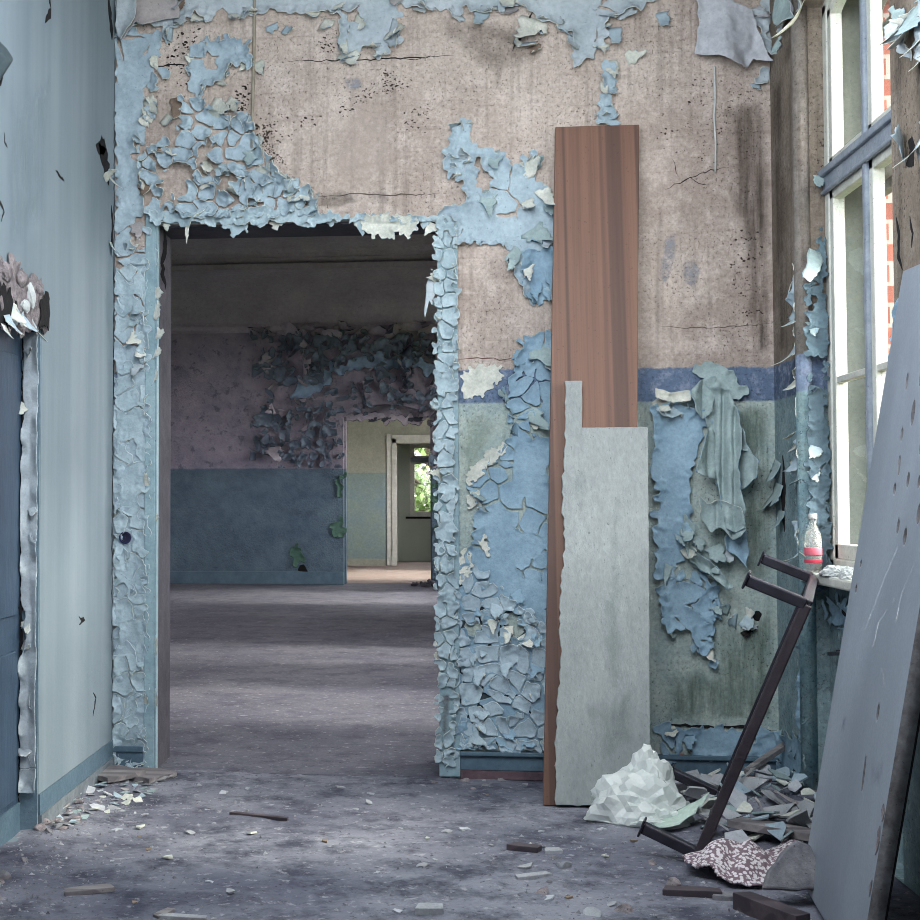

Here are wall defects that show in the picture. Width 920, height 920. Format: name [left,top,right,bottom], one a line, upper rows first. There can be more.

peeling [694,0,804,99]
peeling [878,0,920,71]
peeling [813,175,825,187]
peeling [890,124,920,168]
peeling [649,227,834,669]
peeling [0,253,50,802]
peeling [815,584,848,631]
peeling [718,644,817,843]